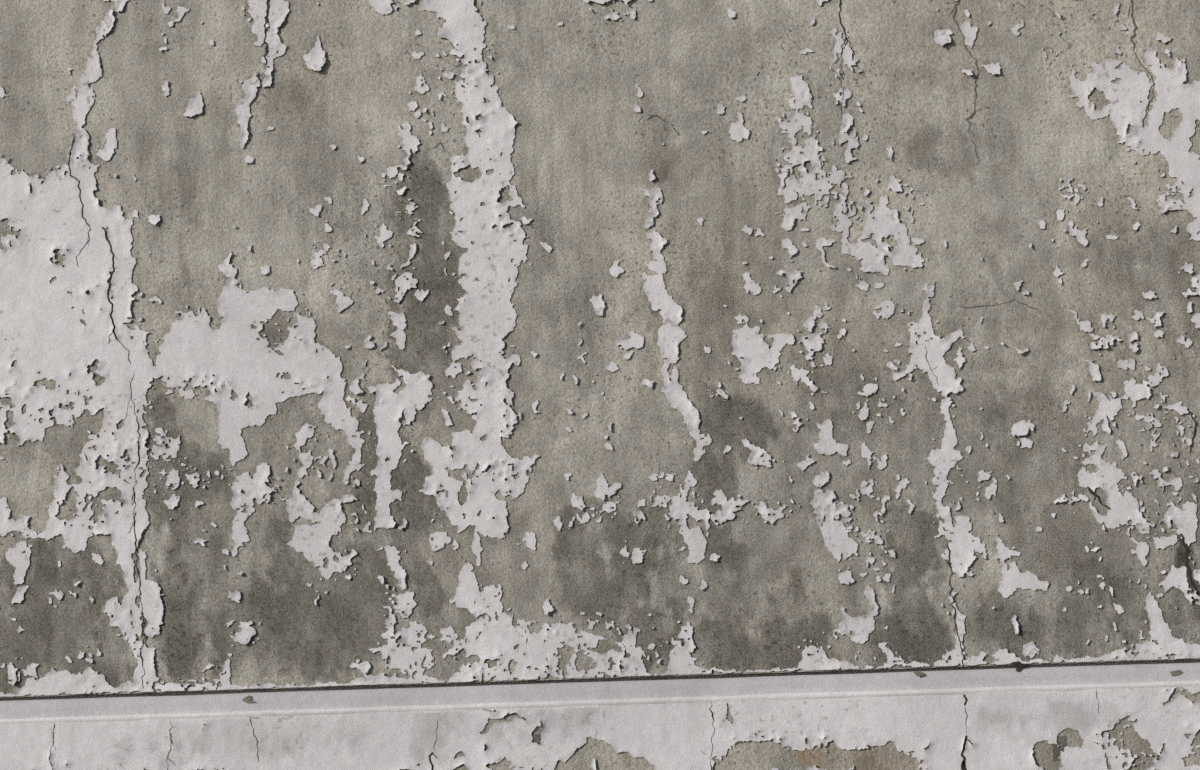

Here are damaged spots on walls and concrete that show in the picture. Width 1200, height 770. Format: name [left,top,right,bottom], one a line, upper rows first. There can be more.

peeling [740,28,928,298]
crack [838,0,854,117]
crack [947,0,982,167]
peeling [1058,21,1200,241]
crack [68,133,146,687]
peeling [728,303,846,432]
peeling [873,282,1049,620]
peeling [1051,290,1200,567]
crack [944,540,965,663]
crack [1182,536,1200,595]
peeling [712,733,930,770]
crack [961,695,972,770]